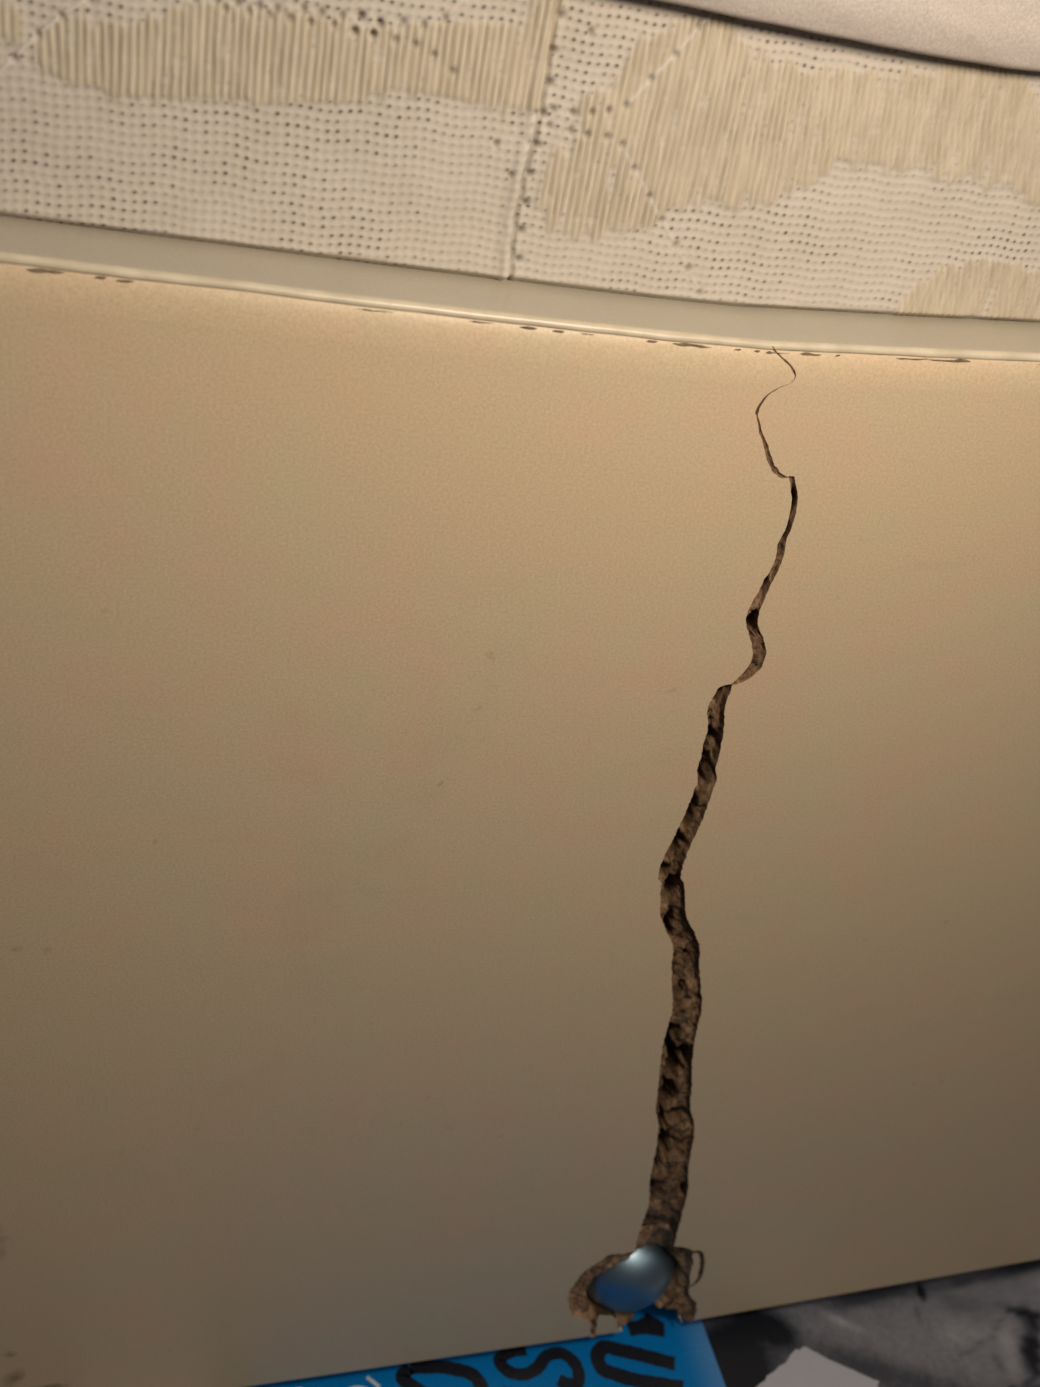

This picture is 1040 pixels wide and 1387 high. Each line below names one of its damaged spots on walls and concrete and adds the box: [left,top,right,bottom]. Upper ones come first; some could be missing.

crack [643,347,798,1239]